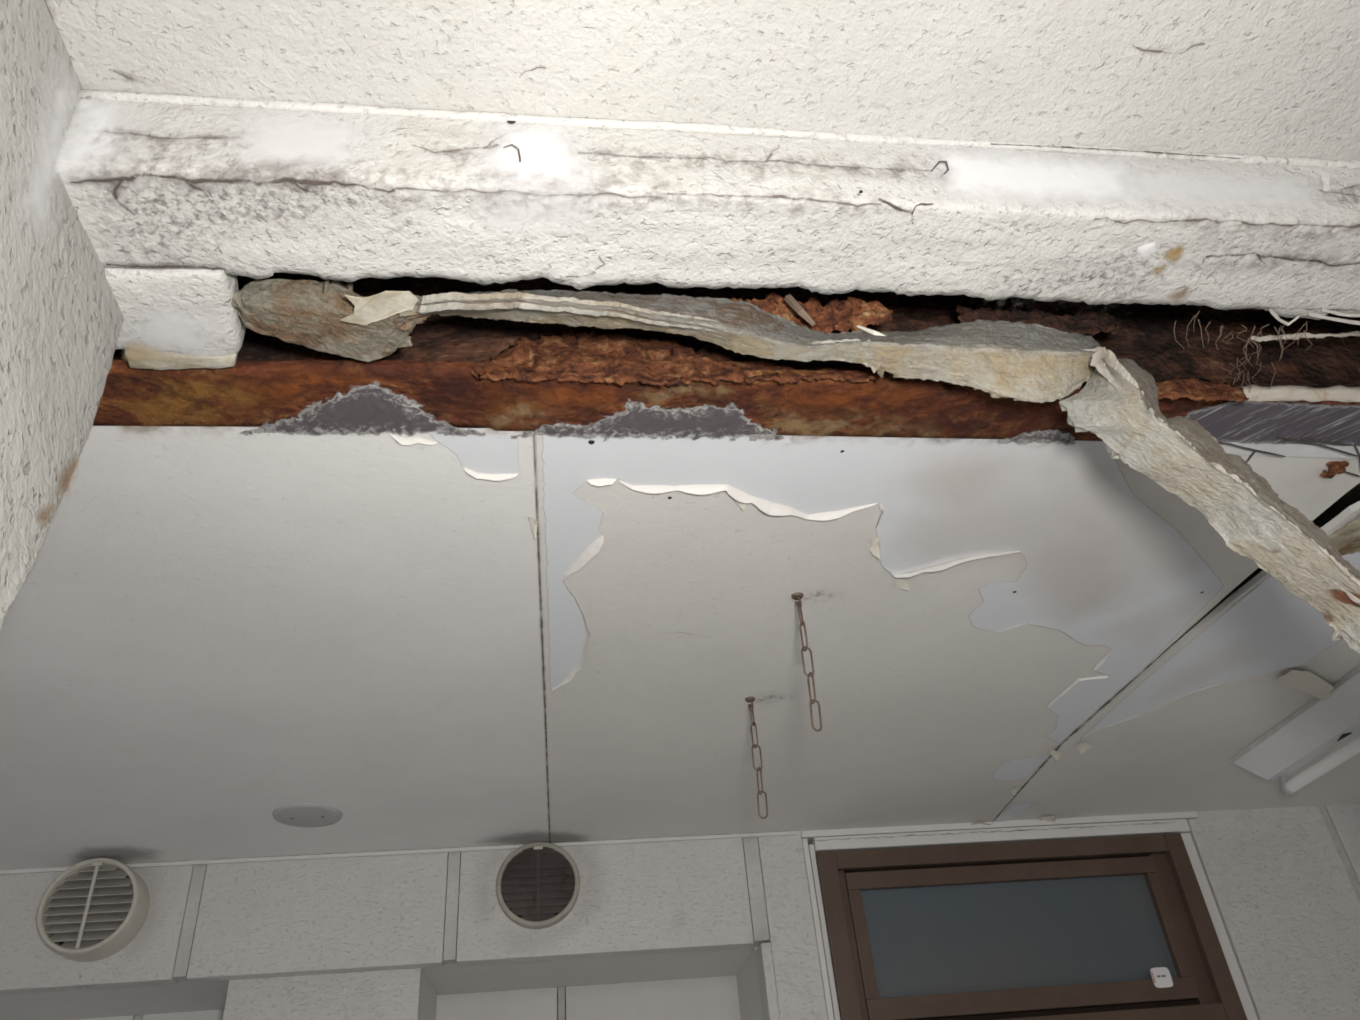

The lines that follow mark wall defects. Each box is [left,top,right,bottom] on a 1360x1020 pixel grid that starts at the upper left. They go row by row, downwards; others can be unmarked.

crack [104,131,227,139]
crack [421,138,499,153]
crack [70,174,532,215]
crack [568,152,934,214]
peeling [340,291,418,325]
peeling [1269,308,1360,326]
spalling [125,349,238,370]
rust [133,369,362,425]
rust [469,328,914,437]
peeling [241,382,1360,795]
crack [808,599,1223,841]